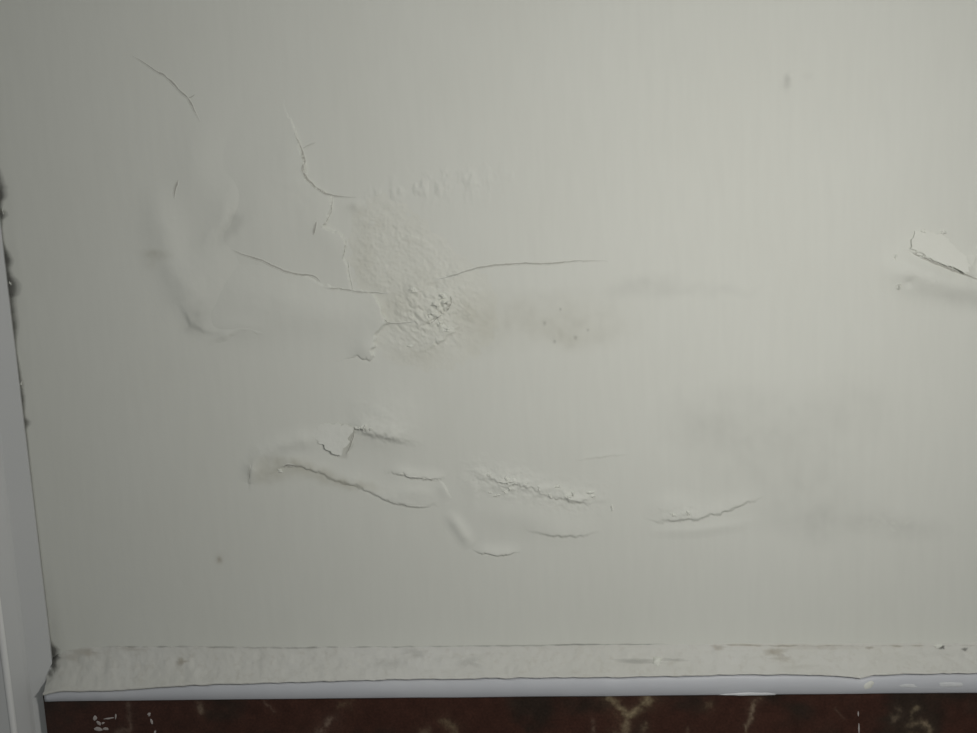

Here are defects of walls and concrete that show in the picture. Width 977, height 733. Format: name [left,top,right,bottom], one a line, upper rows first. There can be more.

crack [132,55,200,122]
crack [294,133,356,235]
crack [231,239,388,295]
crack [433,259,608,281]